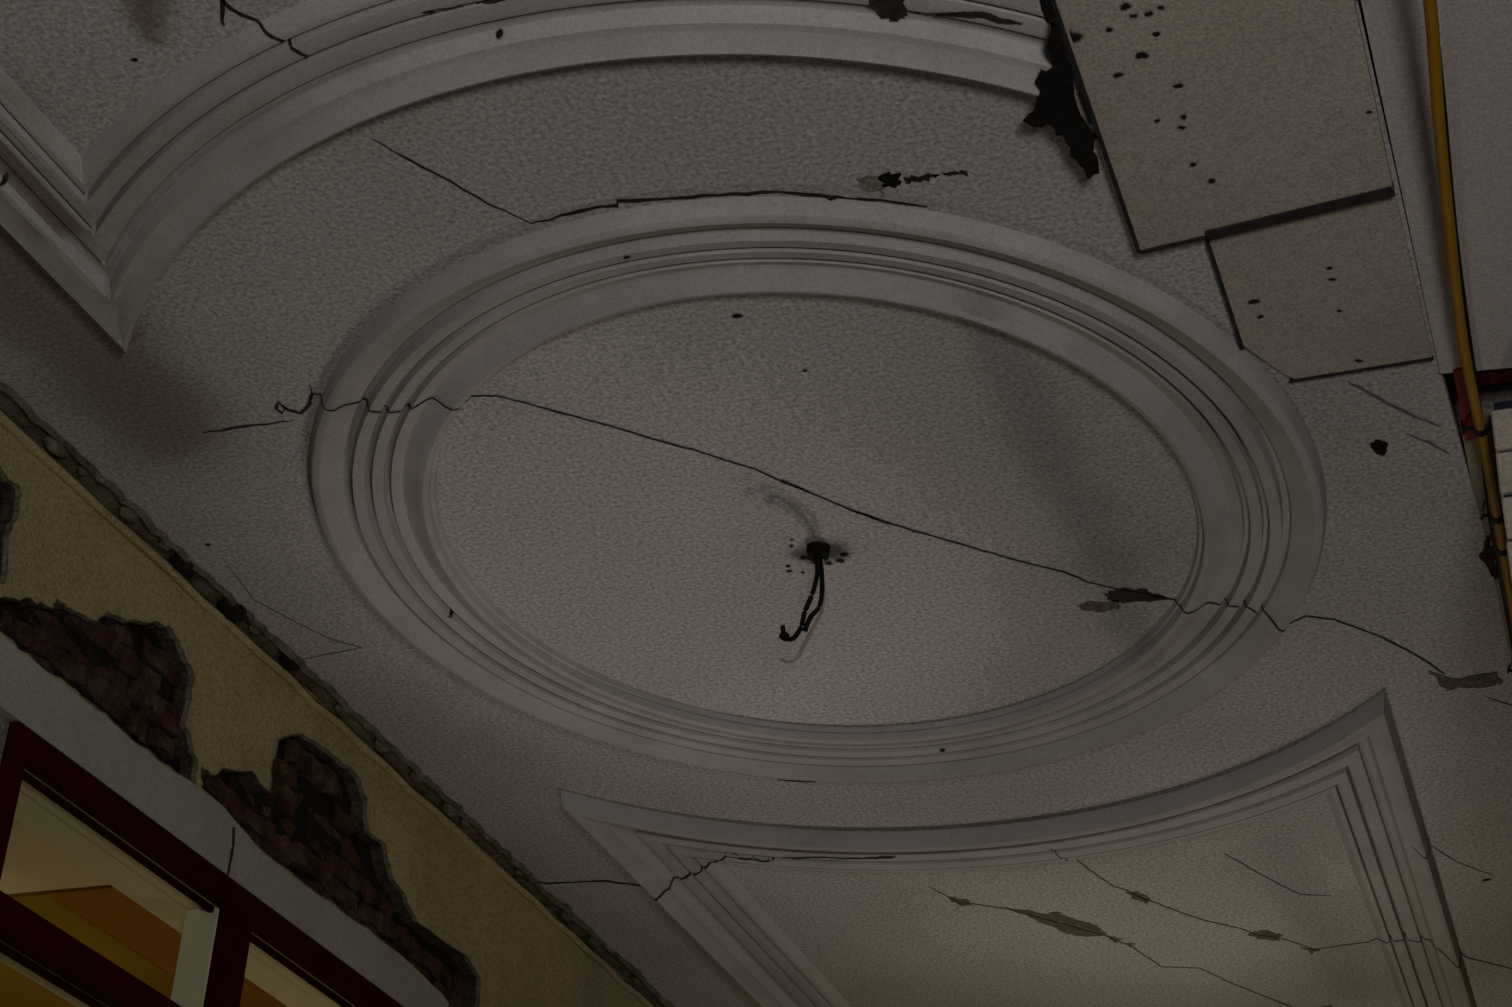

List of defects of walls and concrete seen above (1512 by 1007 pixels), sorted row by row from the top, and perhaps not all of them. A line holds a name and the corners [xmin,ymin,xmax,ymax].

crack [220,0,310,57]
crack [422,0,505,14]
crack [911,11,1023,25]
spalling [1023,0,1099,179]
spalling [856,170,968,195]
crack [203,381,1449,675]
spalling [0,381,676,1007]
crack [513,852,896,901]
peeling [1006,907,1135,948]
peeling [1126,891,1150,904]
peeling [1247,930,1283,941]
crack [1050,849,1512,969]